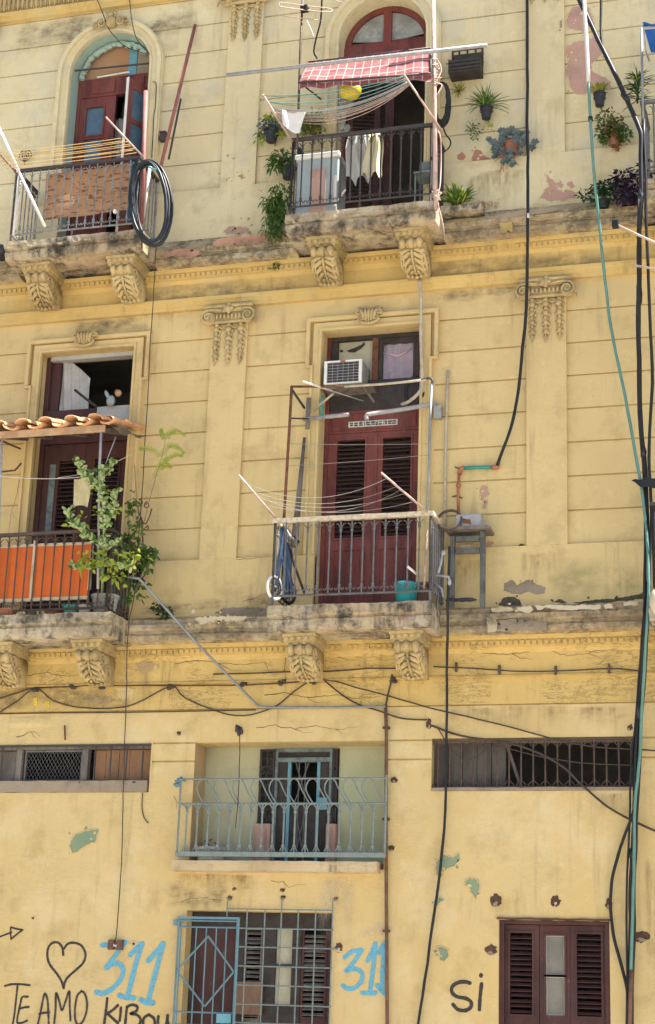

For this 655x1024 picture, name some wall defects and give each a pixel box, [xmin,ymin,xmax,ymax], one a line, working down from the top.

peeling [559,5,611,97]
peeling [457,147,491,161]
peeling [491,171,578,233]
peeling [161,217,287,262]
peeling [487,580,638,633]
crack [176,657,377,733]
peeling [69,826,98,854]
peeling [435,853,460,881]
peeling [465,877,502,907]